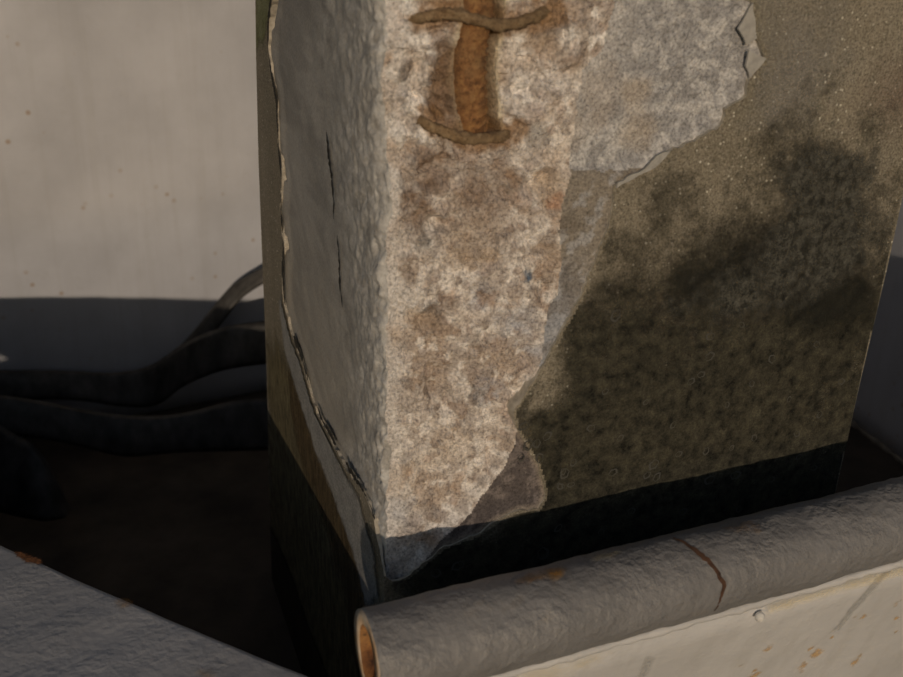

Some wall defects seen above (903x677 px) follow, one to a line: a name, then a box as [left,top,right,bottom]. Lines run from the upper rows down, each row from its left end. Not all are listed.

spalling [271,0,767,579]
crack [672,537,726,611]